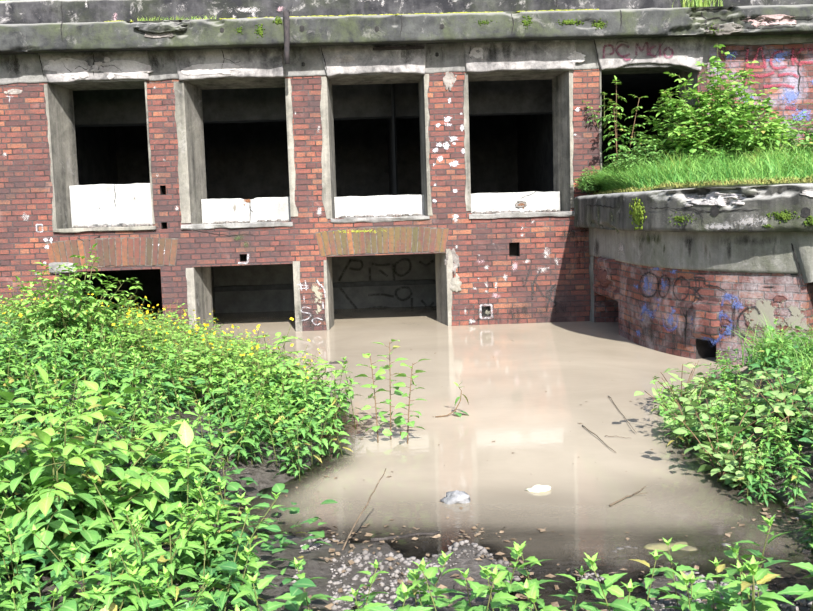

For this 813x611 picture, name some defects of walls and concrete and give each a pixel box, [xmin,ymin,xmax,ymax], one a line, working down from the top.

spalling [705,14,797,36]
spalling [685,191,746,207]
spalling [444,248,462,292]